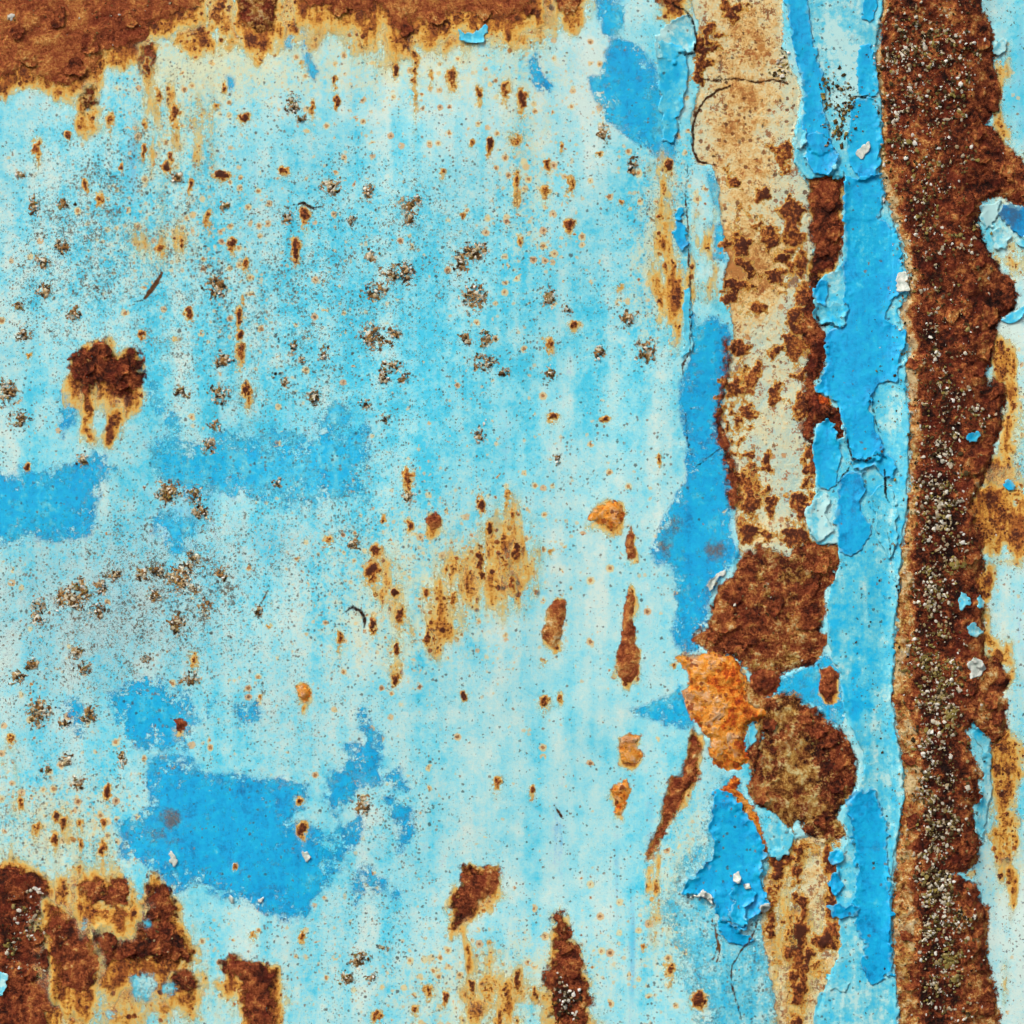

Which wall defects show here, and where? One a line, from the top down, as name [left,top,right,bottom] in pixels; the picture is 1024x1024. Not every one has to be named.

corrosion [61,330,147,450]
corrosion [0,0,595,208]
crack [671,0,788,374]
corrosion [799,176,845,448]
peeling [979,199,1024,250]
peeling [1001,306,1024,324]
corrosion [363,489,553,688]
peeling [589,0,910,1024]
corrosion [875,0,1024,1024]
corrosion [670,539,859,853]
corrosion [0,811,289,1024]
corrosion [411,862,596,1024]